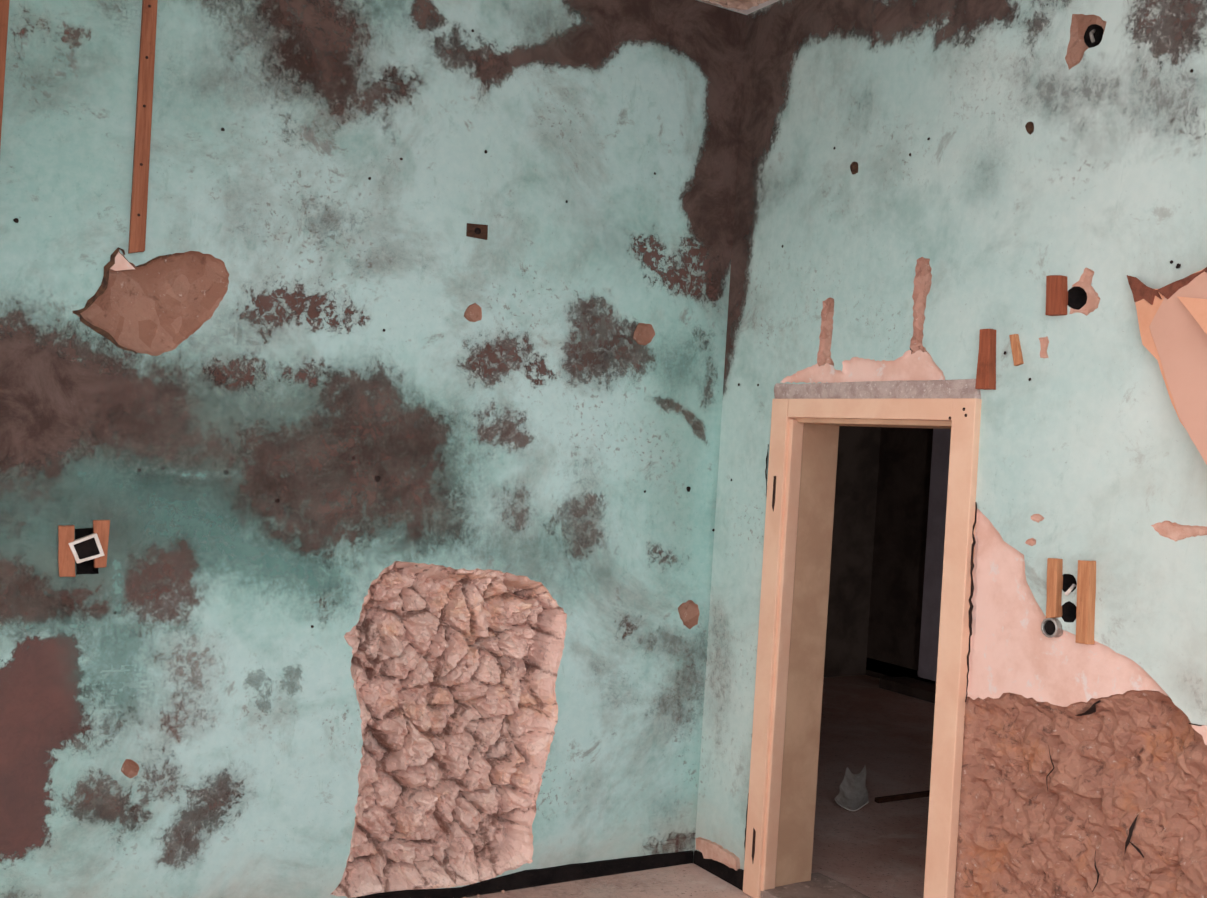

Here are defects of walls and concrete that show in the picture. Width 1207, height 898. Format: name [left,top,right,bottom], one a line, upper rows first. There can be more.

peeling [708,0,769,10]
damp [1125,0,1207,66]
damp [221,0,1072,453]
flaking render [781,257,945,383]
damp [0,299,464,868]
spalling [331,561,567,898]
damp [550,494,604,559]
spalling [954,509,1207,898]